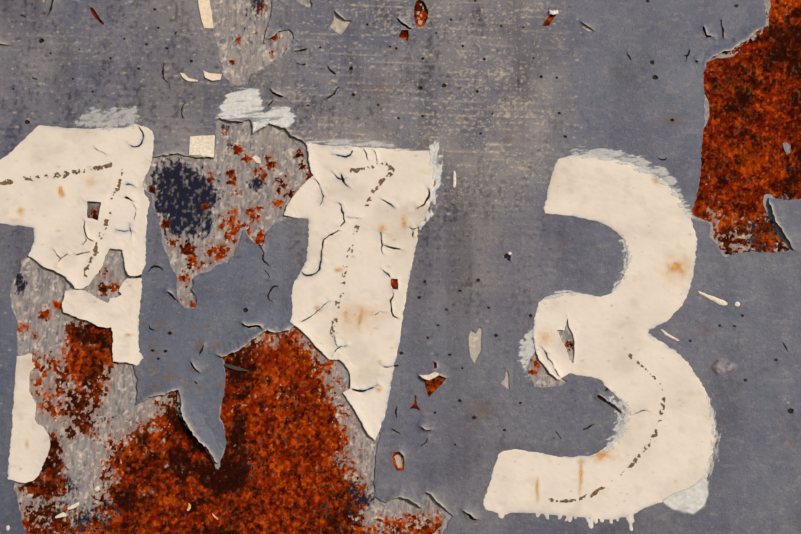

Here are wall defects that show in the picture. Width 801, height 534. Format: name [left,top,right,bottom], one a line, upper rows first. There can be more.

peeling [180,0,294,86]
peeling [692,0,801,257]
peeling [142,118,317,309]
crack [302,149,377,276]
crack [380,189,430,252]
peeling [7,201,452,534]
peeling [527,352,566,388]
peeling [557,318,574,363]